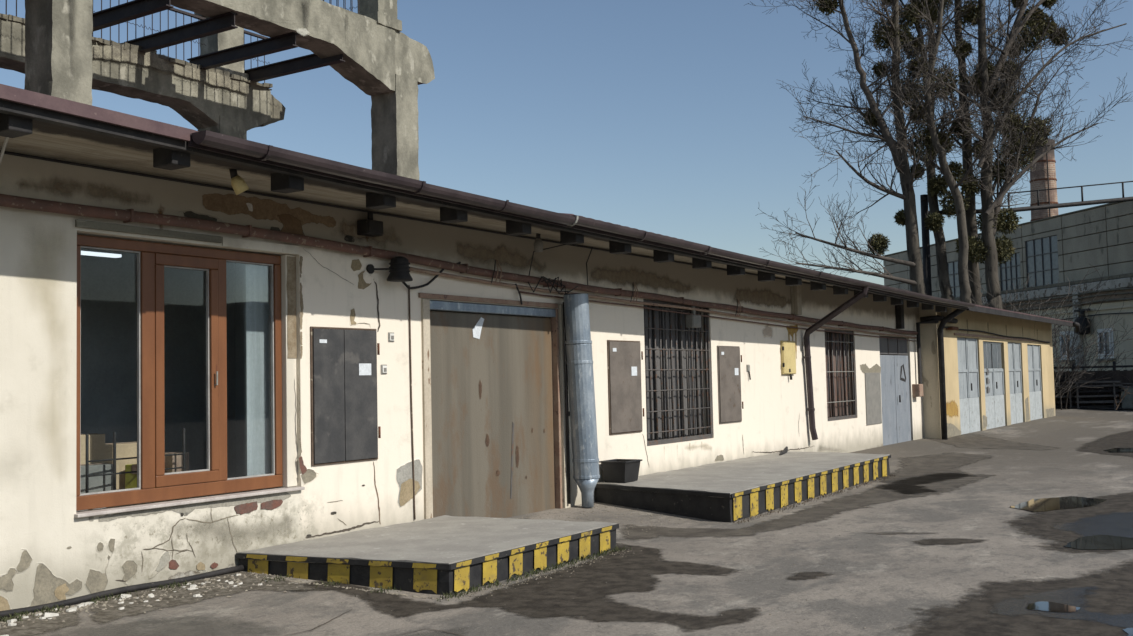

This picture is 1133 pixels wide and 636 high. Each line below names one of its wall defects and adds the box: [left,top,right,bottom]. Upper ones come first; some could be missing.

flaking render [176,193,336,235]
flaking render [350,258,374,290]
flaking render [349,307,358,326]
flaking render [299,456,319,485]
flaking render [395,458,423,508]
flaking render [89,492,291,522]
crack [116,508,238,582]
flaking render [0,537,236,611]